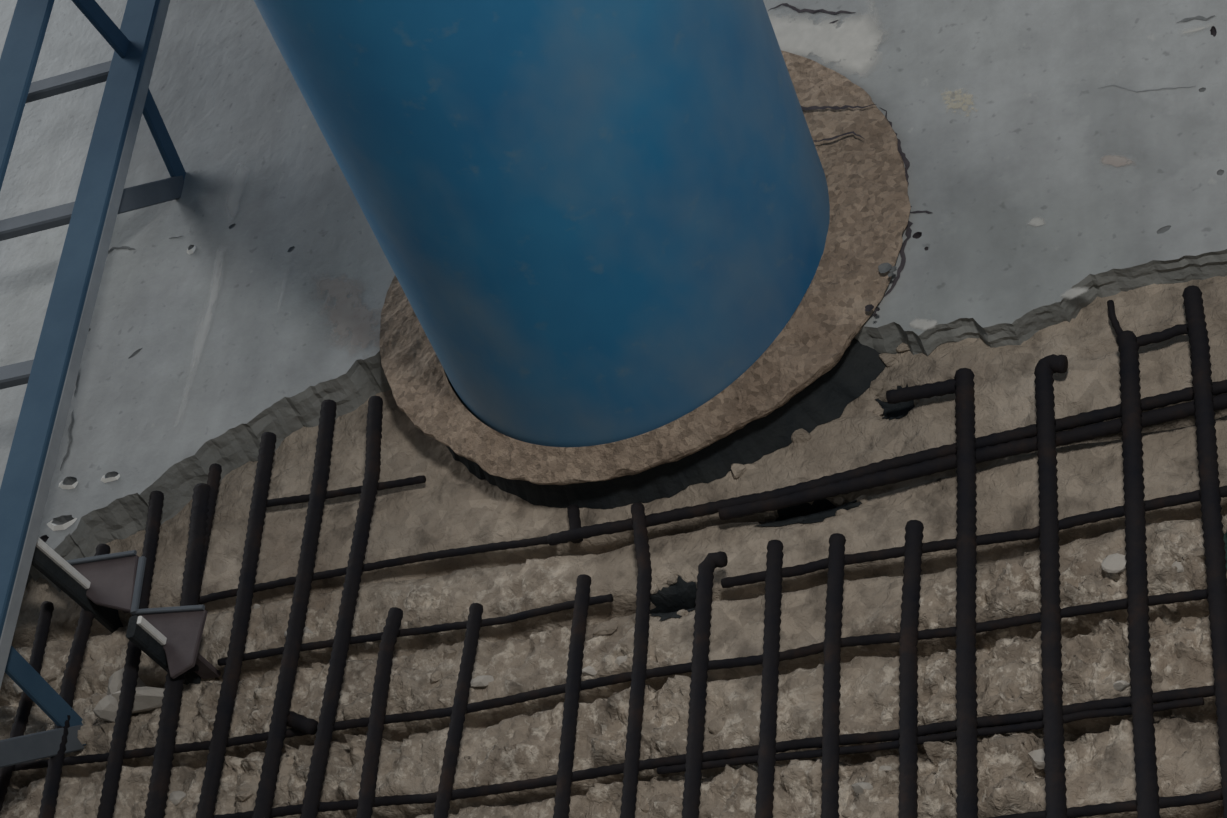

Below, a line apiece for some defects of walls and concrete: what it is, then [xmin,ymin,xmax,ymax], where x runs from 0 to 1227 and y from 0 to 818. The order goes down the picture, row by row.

crack [768,3,856,23]
spalling [0,249,1227,818]